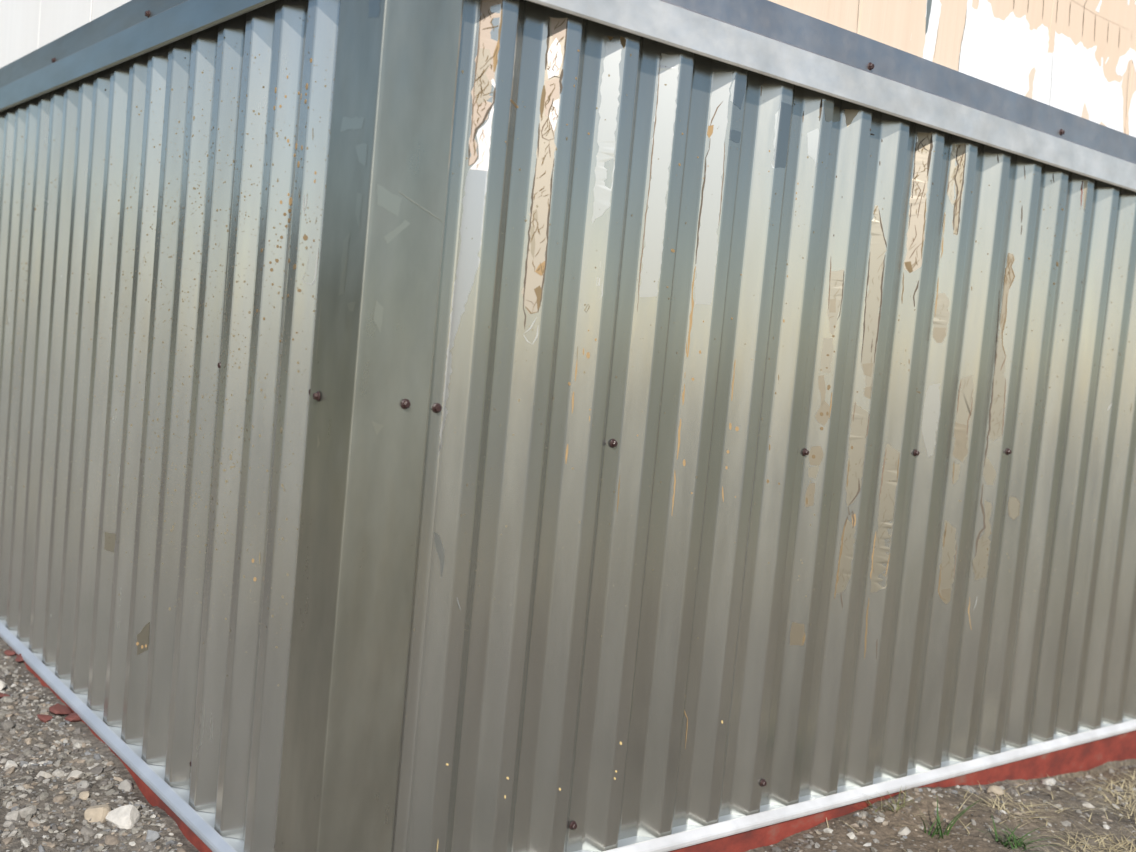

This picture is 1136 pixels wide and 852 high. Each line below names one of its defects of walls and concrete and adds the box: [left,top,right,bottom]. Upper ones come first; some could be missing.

peeling [469,0,502,171]
peeling [923,0,942,61]
peeling [958,0,1136,137]
peeling [521,17,567,314]
peeling [904,132,933,272]
peeling [951,144,966,235]
peeling [1000,253,1015,333]